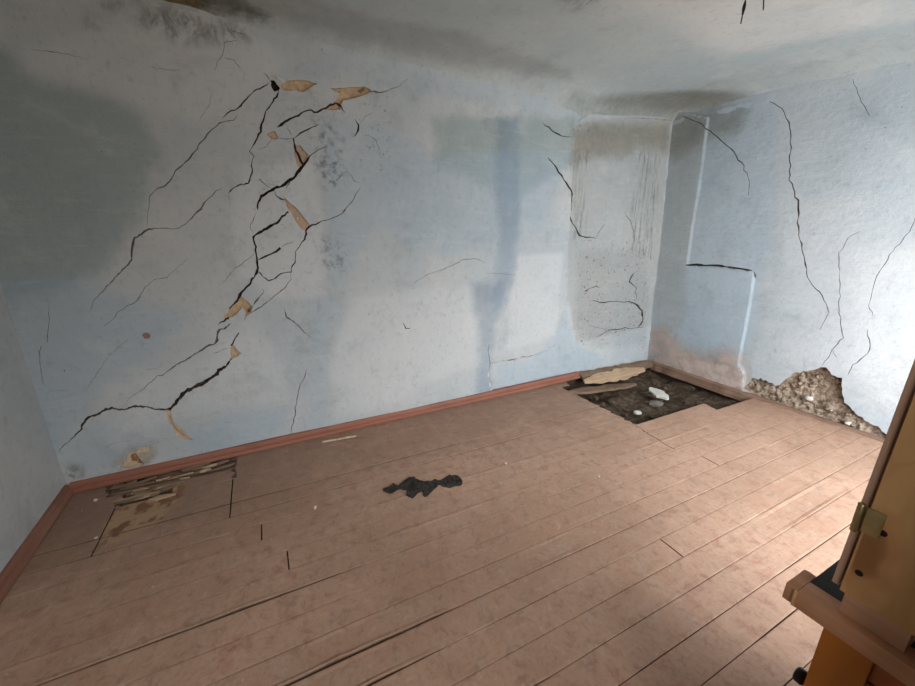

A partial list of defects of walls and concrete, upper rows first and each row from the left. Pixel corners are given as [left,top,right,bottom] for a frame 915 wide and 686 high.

water stain [164,0,259,15]
flaking render [271,75,317,92]
flaking render [327,86,371,110]
crack [683,116,750,194]
flaking render [284,198,310,231]
crack [771,102,915,374]
crack [59,73,380,450]
crack [687,263,756,278]
flaking render [224,297,253,320]
spalling [744,367,886,438]